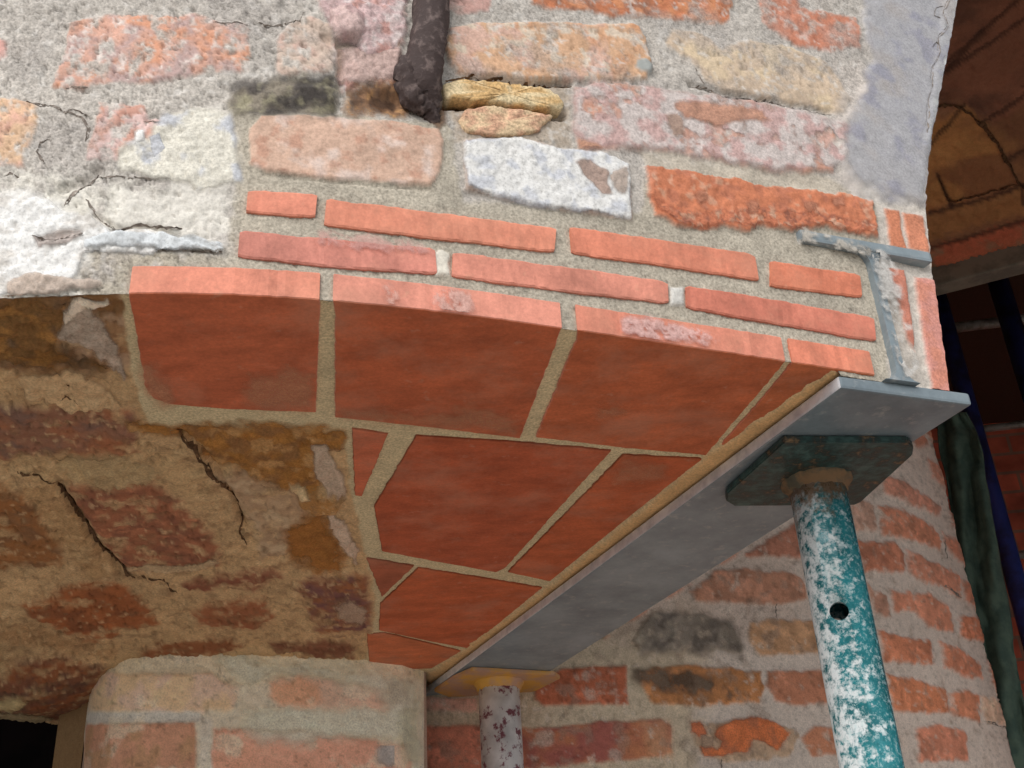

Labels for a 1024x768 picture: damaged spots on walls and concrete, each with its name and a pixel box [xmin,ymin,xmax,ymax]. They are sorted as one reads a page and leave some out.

crack [26,86,90,141]
peeling [0,196,222,324]
crack [32,175,222,254]
crack [17,471,177,593]
crack [176,429,247,545]